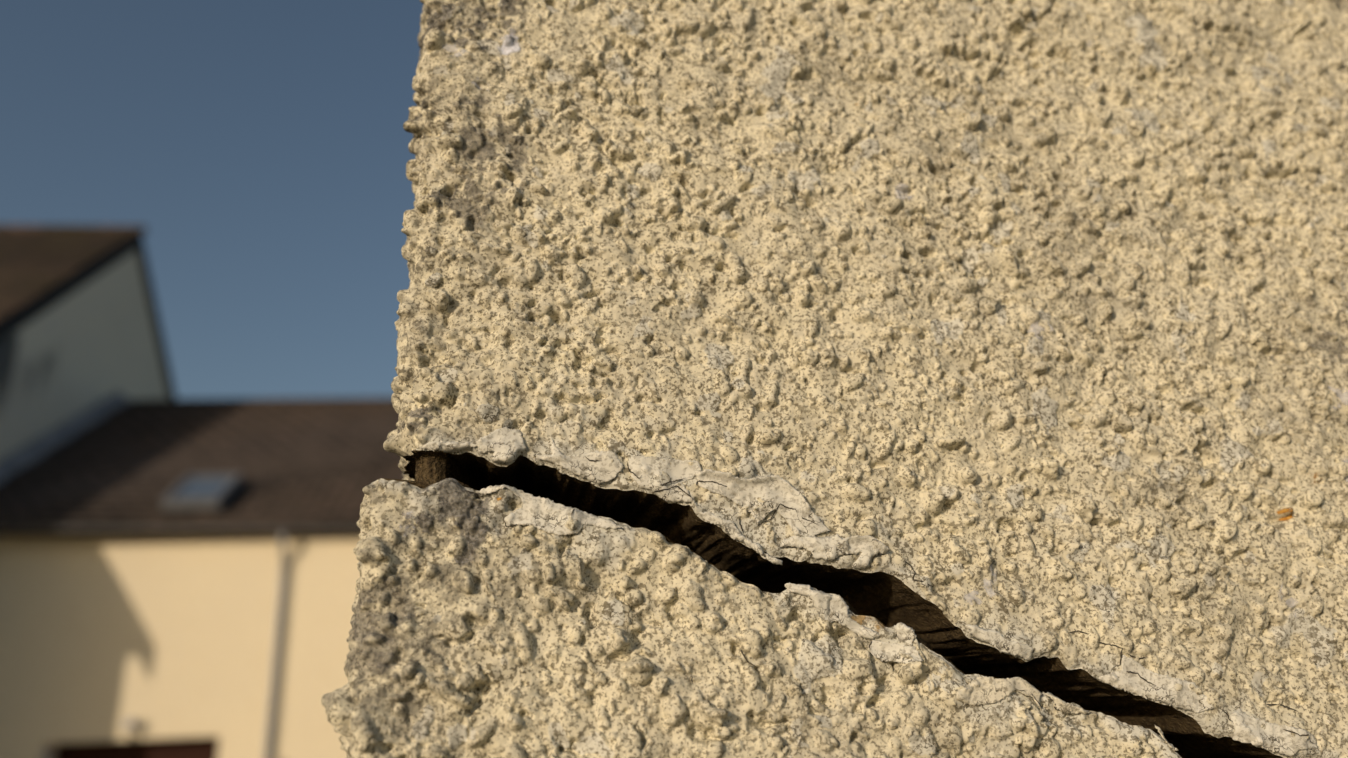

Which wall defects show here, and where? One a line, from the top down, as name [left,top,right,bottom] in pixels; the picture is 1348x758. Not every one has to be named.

crack [382,450,1313,758]